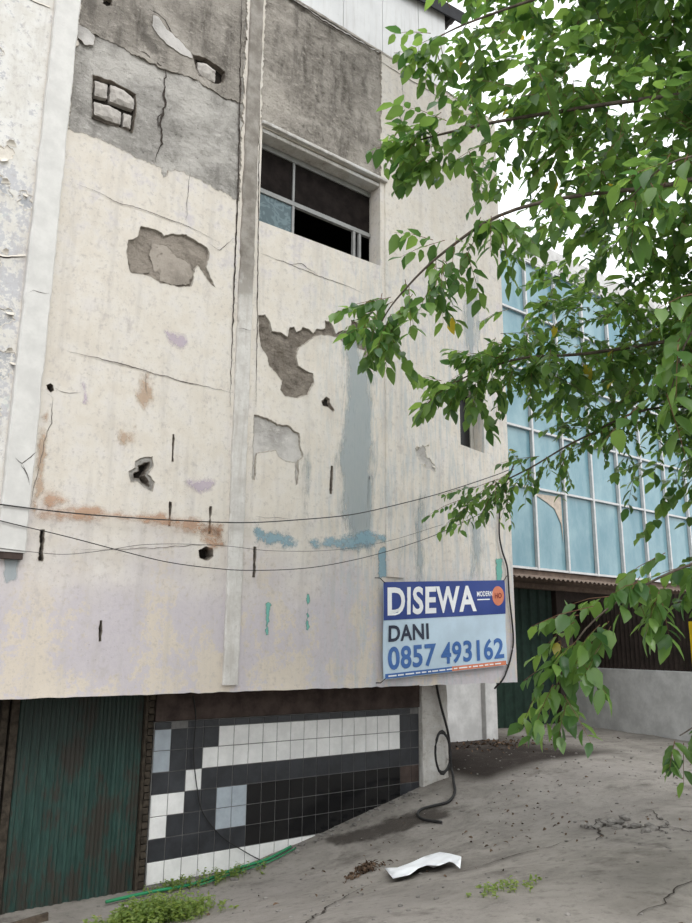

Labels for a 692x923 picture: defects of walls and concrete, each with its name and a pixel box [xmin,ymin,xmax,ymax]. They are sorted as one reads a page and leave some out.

flaking render [68,0,248,202]
crack [72,3,362,395]
flaking render [126,226,215,287]
peeling [0,308,15,327]
peeling [0,348,16,380]
flaking render [258,314,358,398]
flaking render [129,456,155,492]
flaking render [252,414,304,485]
water stain [310,340,386,577]
rust [45,495,100,519]
rust [139,514,223,547]
water stain [255,527,294,546]